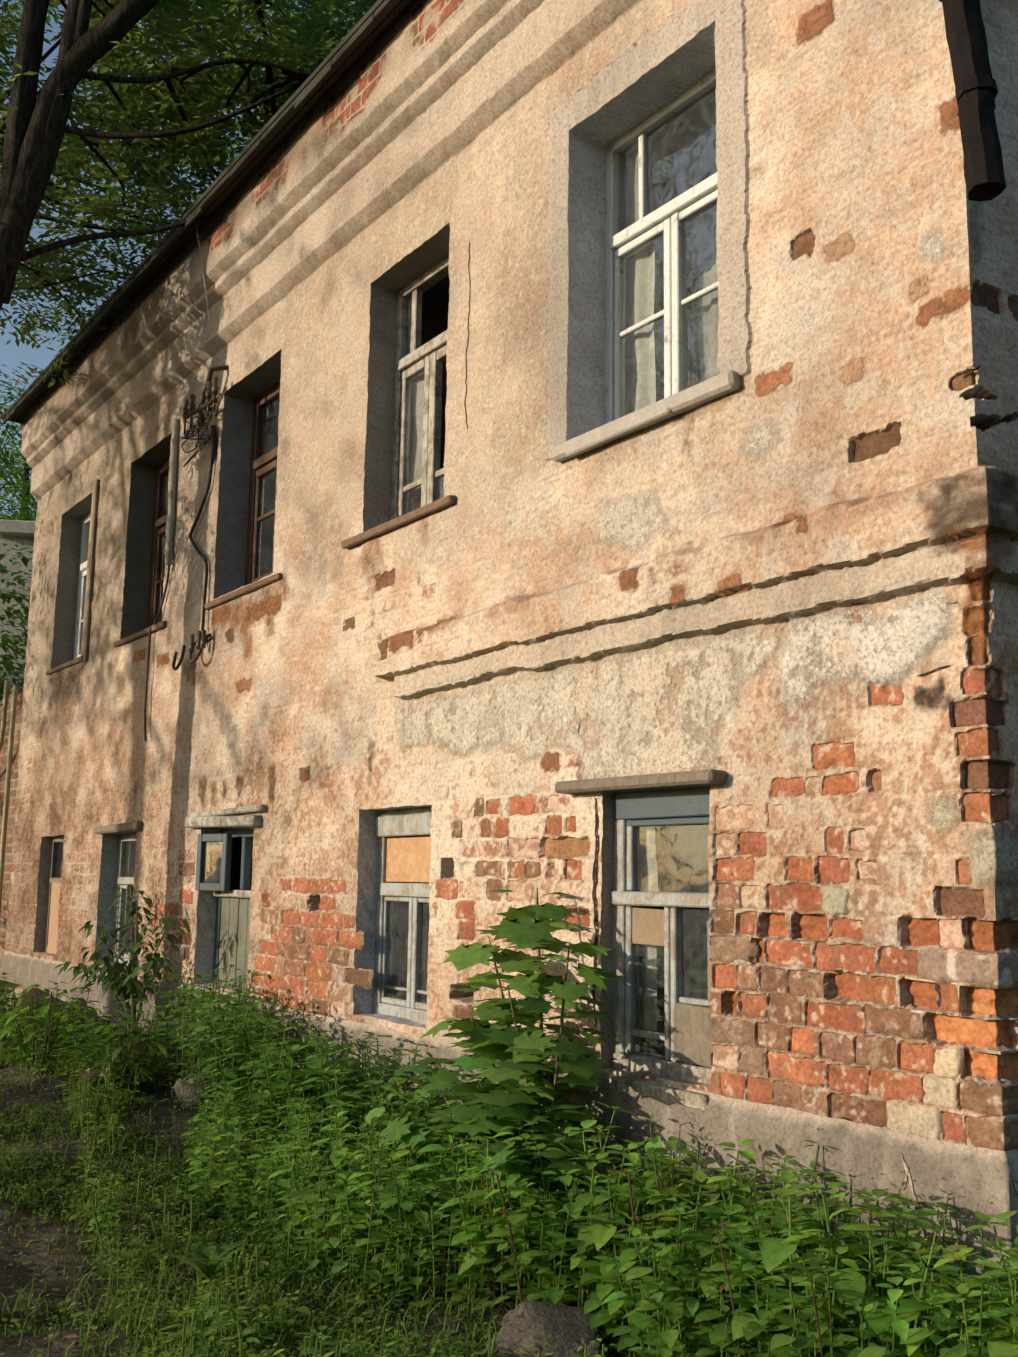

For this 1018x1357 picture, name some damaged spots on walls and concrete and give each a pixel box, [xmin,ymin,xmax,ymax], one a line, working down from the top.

spalling [796,0,835,45]
crack [463,242,471,429]
spalling [908,275,1018,327]
spalling [950,371,977,391]
spalling [854,424,902,462]
damp [926,471,1018,547]
flaking render [436,794,590,940]
flaking render [253,877,374,1020]
crack [591,798,599,1026]
flaking render [709,742,1018,1151]
flaking render [438,987,475,1021]